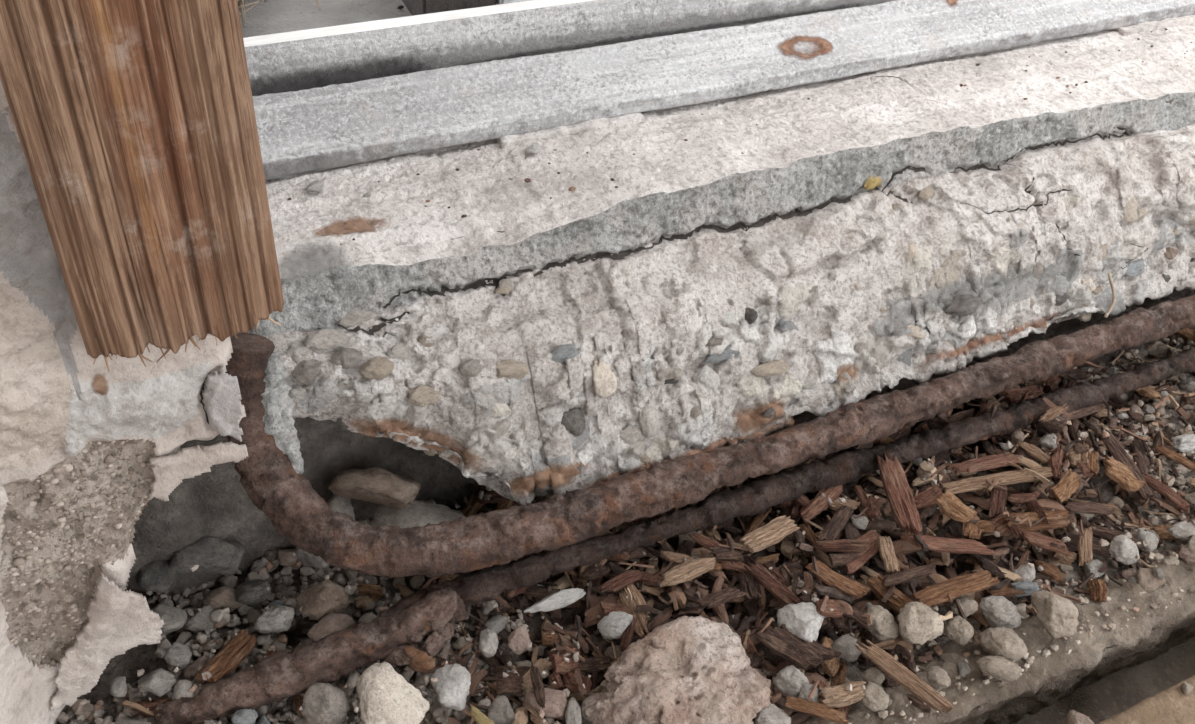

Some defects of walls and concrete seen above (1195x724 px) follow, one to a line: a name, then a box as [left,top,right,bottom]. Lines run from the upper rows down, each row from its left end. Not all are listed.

corrosion [779,36,833,59]
corrosion [317,217,384,236]
spalling [263,124,1195,506]
crack [335,127,1130,337]
spalling [0,370,249,710]
corrosion [153,295,1195,724]